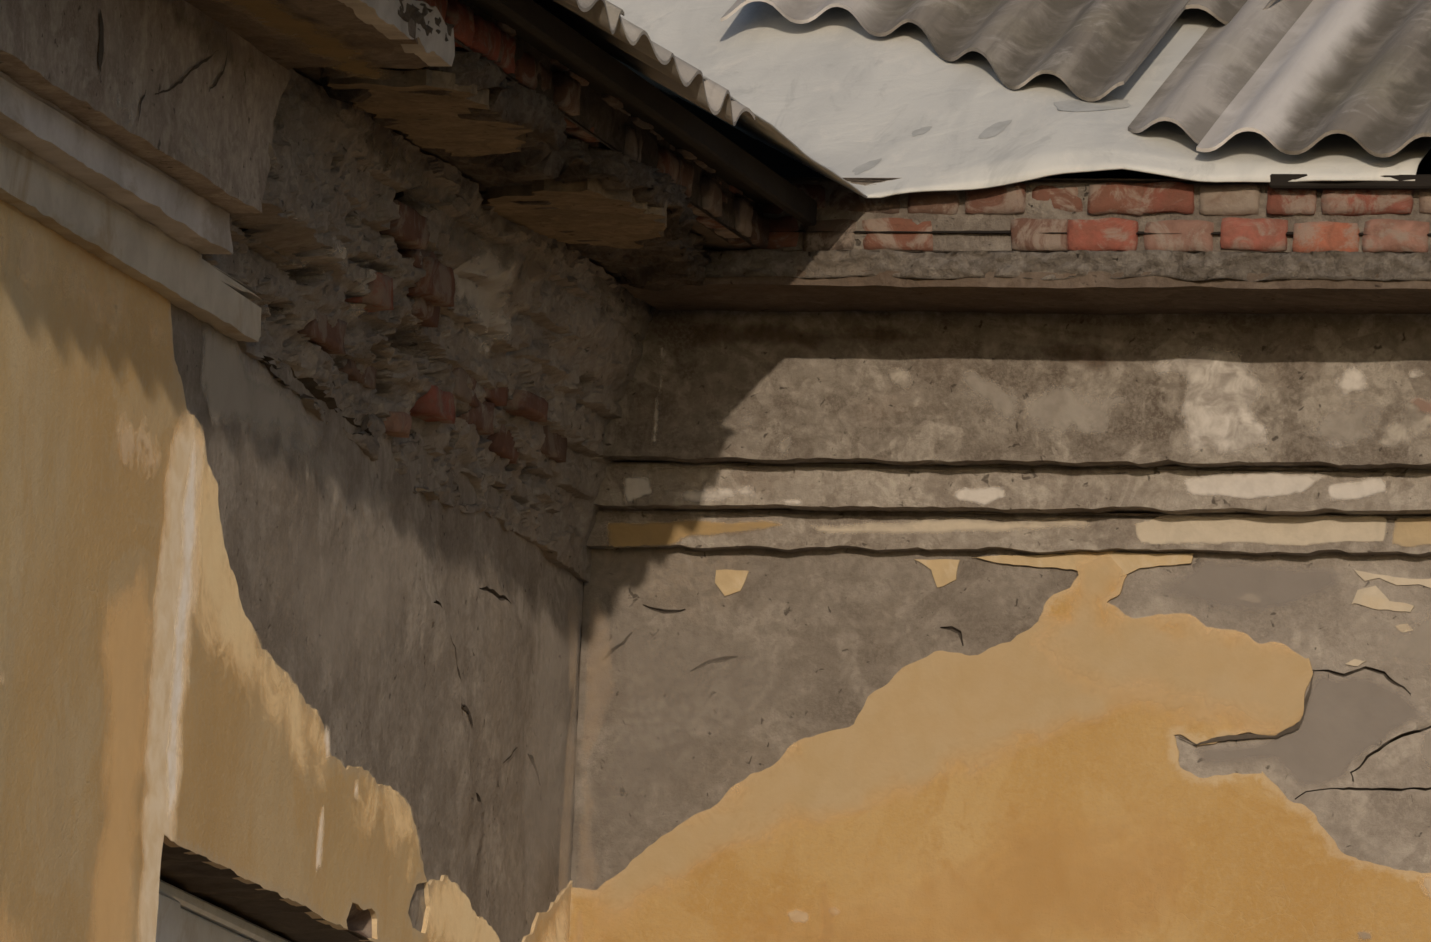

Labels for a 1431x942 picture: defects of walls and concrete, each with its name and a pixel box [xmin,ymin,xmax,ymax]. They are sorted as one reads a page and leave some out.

flaking render [140,69,652,942]
peeling [956,487,1004,504]
peeling [1186,473,1385,499]
peeling [818,519,1086,533]
peeling [1136,515,1386,546]
peeling [1393,518,1431,547]
crack [479,586,511,603]
crack [434,600,473,727]
crack [1179,666,1411,746]
flaking render [571,547,1431,909]
crack [503,747,541,785]
crack [1295,726,1431,800]